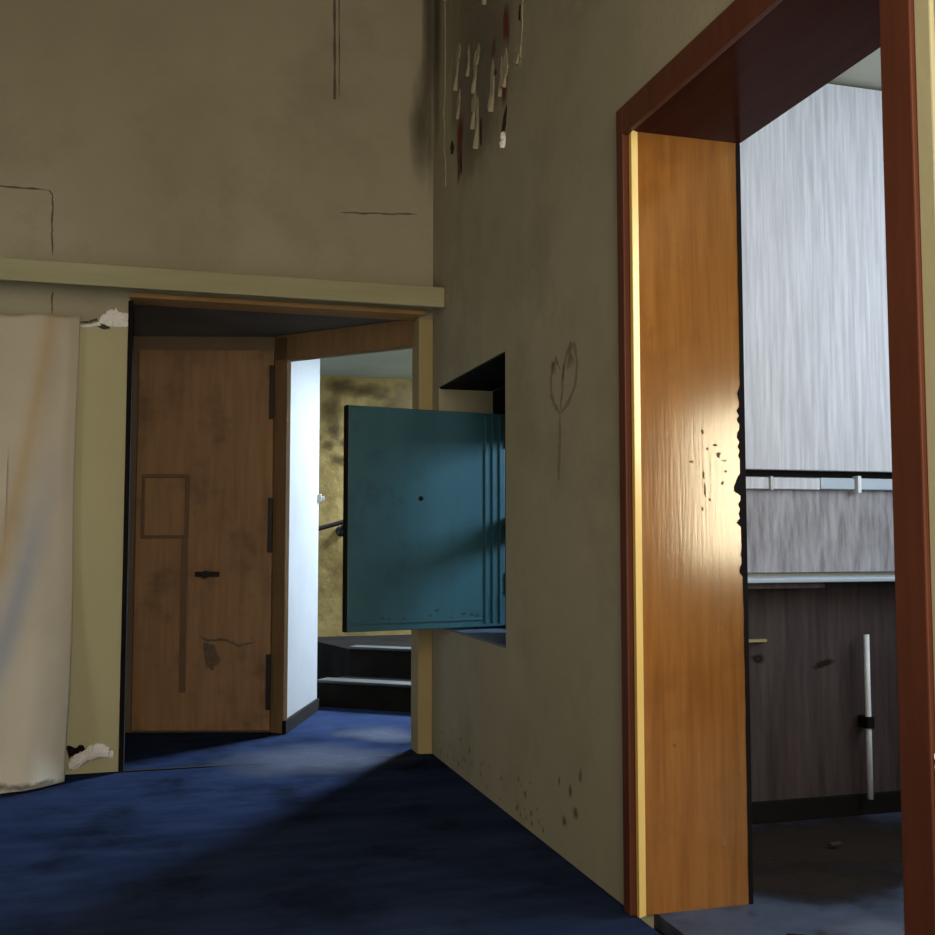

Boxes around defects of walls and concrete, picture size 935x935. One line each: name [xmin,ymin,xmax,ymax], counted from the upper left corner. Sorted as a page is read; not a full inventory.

crack [332,0,340,99]